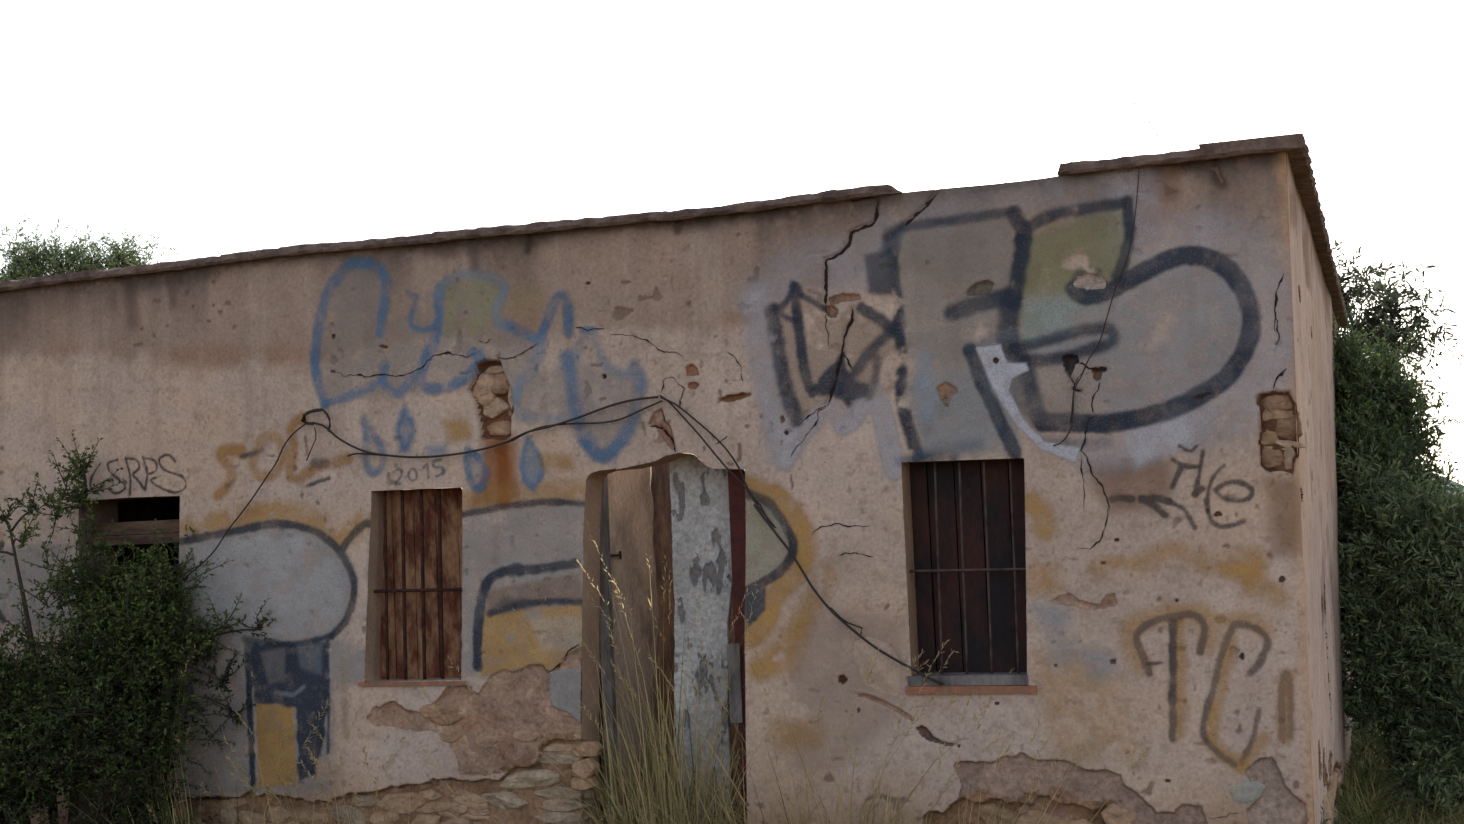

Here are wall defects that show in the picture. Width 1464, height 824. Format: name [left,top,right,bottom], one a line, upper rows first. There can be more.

crack [791,192,938,456]
flaking render [471,361,514,439]
crack [1070,362,1110,549]
flaking render [1257,391,1308,501]
flaking render [174,648,604,824]
flaking render [838,675,1207,824]
flaking render [1247,739,1344,824]